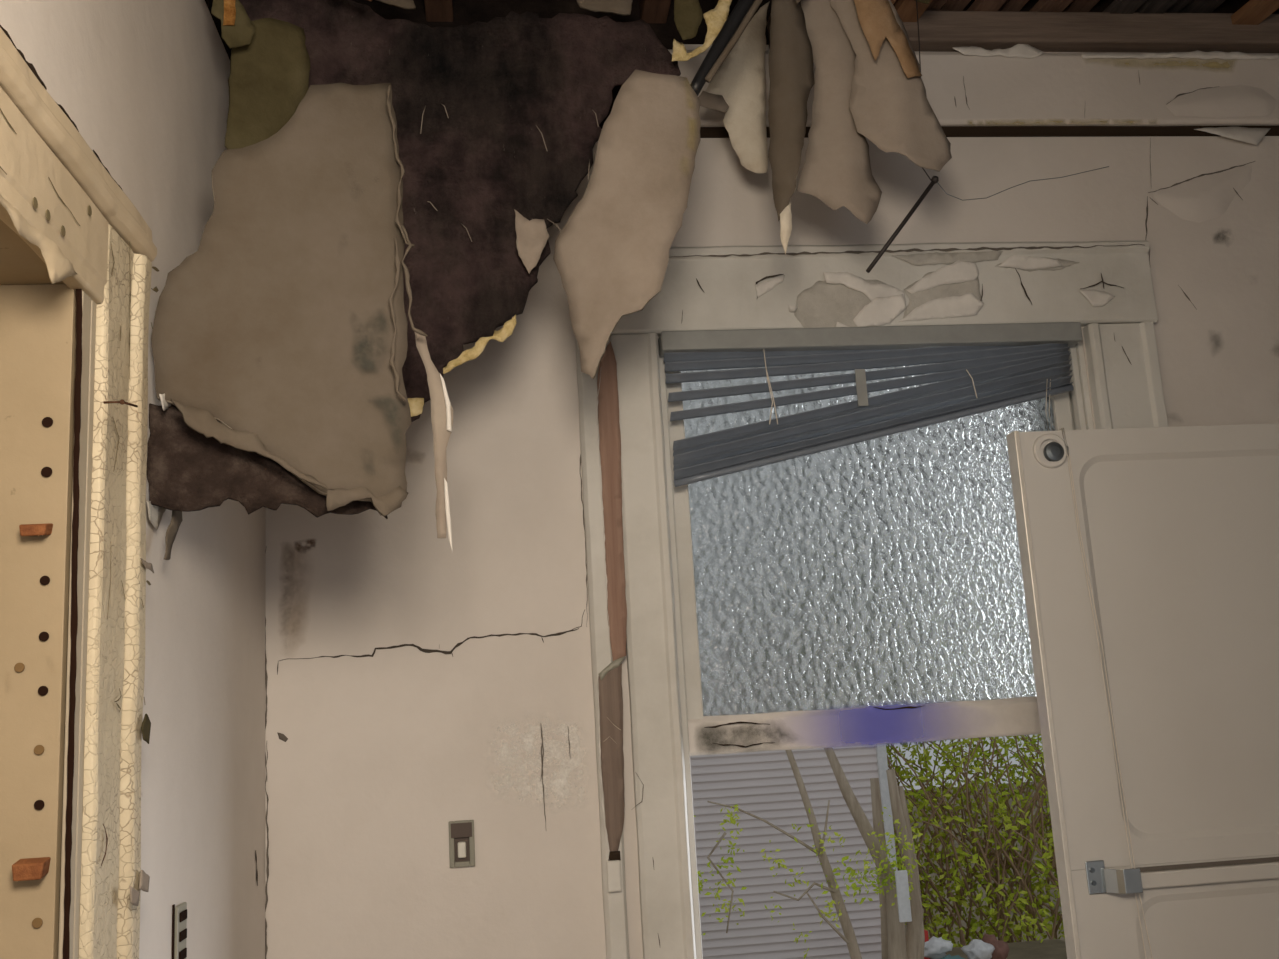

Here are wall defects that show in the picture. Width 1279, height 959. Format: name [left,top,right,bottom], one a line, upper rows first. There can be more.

peeling [789,251,1080,328]
peeling [140,501,183,585]
peeling [141,698,151,744]
crack [265,454,588,959]
peeling [130,870,150,906]